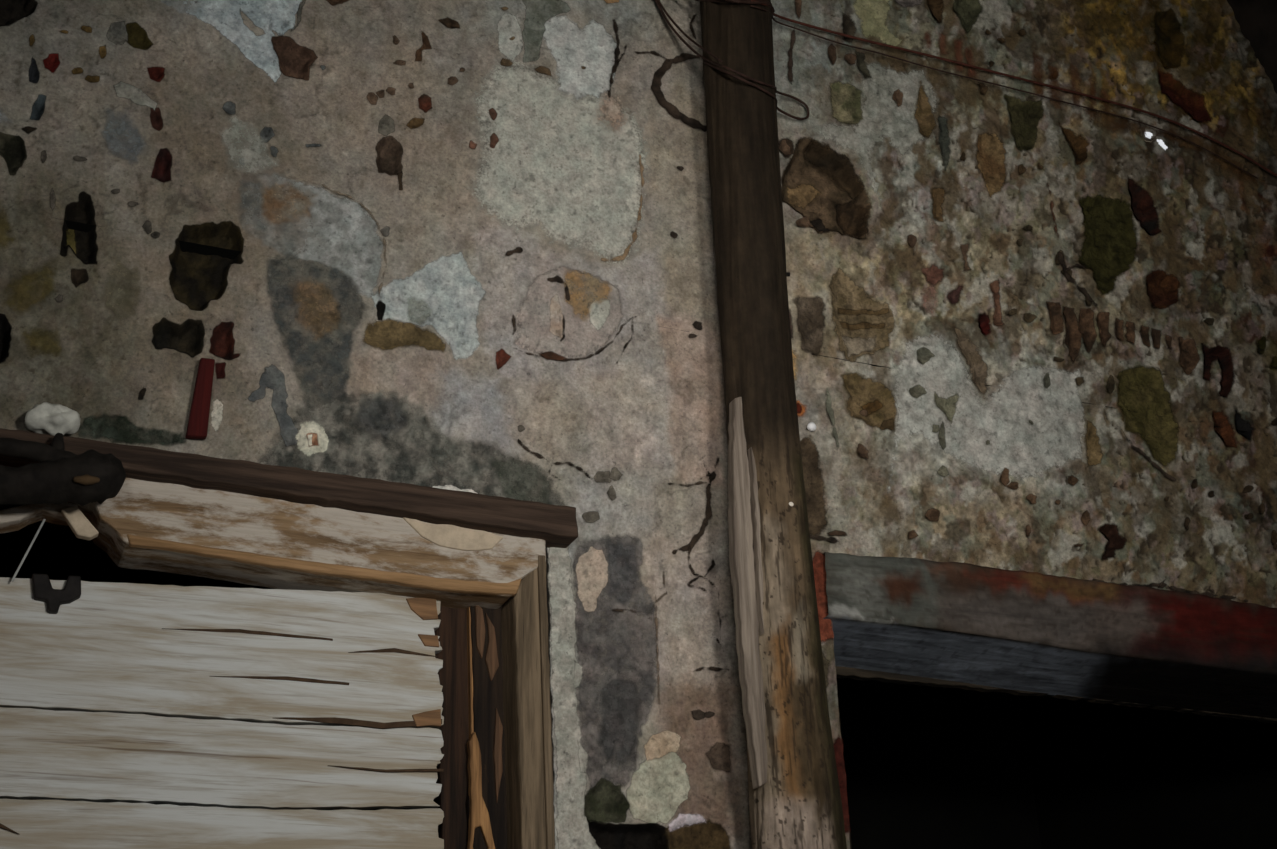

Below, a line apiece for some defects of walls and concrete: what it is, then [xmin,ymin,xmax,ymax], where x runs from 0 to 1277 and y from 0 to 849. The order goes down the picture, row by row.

flaking render [0,0,38,26]
flaking render [0,34,100,175]
flaking render [99,21,153,59]
flaking render [147,66,165,82]
flaking render [50,188,98,287]
peeling [152,176,446,379]
water stain [260,255,564,506]
crack [506,247,523,256]
crack [512,276,637,363]
crack [612,458,729,704]
water stain [573,535,657,789]
peeling [548,547,731,849]